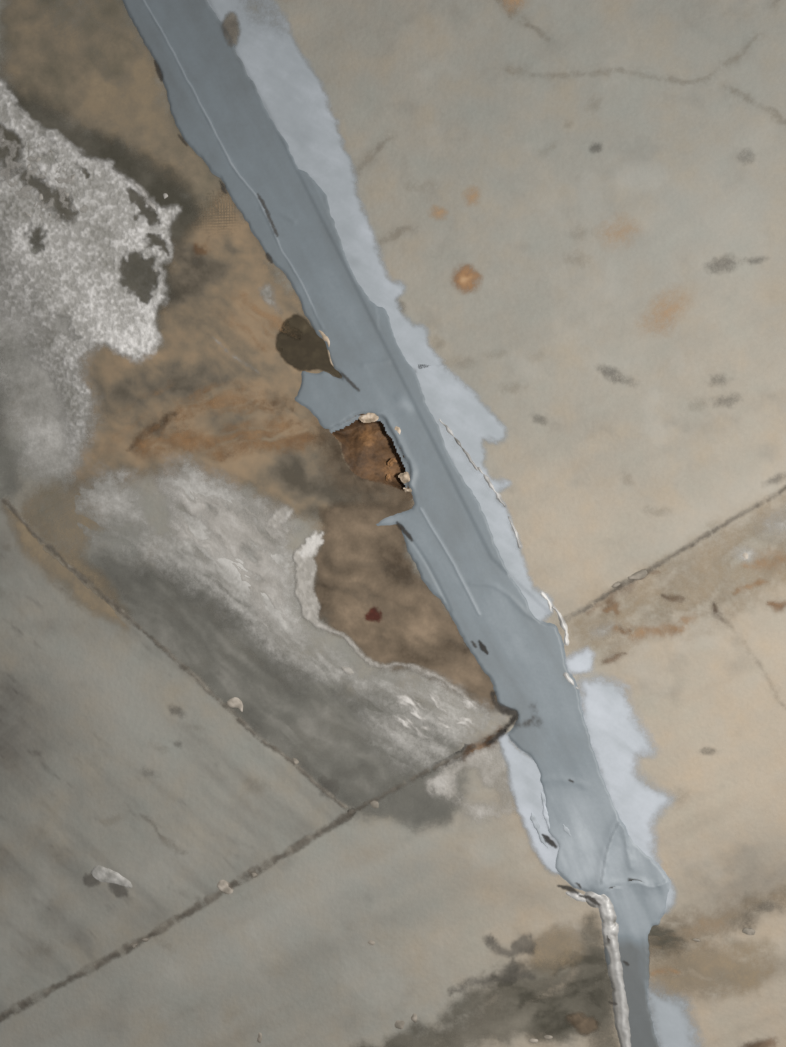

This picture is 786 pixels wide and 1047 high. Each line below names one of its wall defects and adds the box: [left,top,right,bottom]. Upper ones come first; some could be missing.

leakage [0,80,198,489]
corrosion [1,0,499,712]
leakage [75,463,516,828]
peeling [276,315,342,378]
spalling [320,413,413,510]
crack [122,0,700,1047]
leakage [386,918,616,1047]